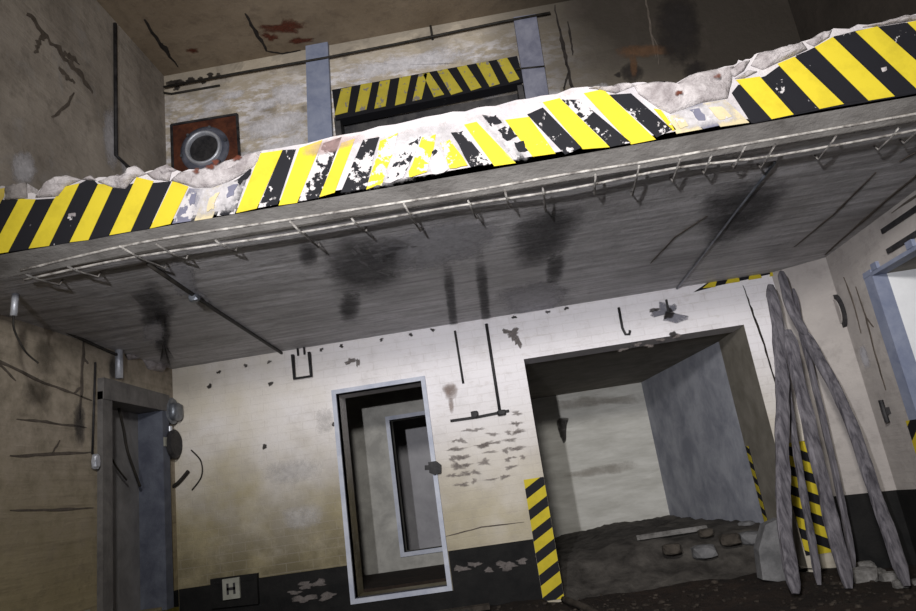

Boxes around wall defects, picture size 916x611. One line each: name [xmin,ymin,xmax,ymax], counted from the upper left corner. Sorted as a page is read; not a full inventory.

crack [26,12,93,117]
rust [262,21,312,44]
crack [554,6,574,91]
spalling [589,30,832,129]
spalling [863,15,916,28]
spalling [4,84,303,215]
spalling [20,112,916,286]
damp [709,192,775,240]
damp [446,278,456,325]
damp [478,268,489,320]
damp [504,210,570,313]
peeling [449,412,525,486]